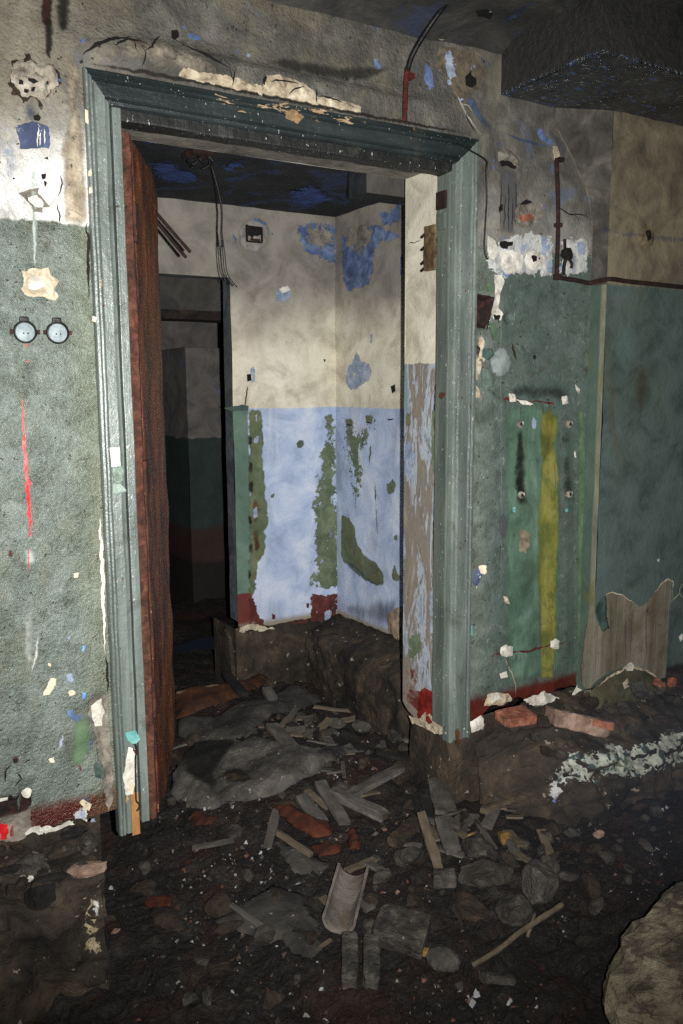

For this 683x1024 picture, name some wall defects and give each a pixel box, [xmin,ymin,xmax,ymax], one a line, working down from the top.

flaking render [3,53,62,160]
flaking render [179,68,365,124]
peeling [423,39,486,122]
flaking render [21,268,59,301]
peeling [297,205,401,291]
peeling [476,198,589,398]
peeling [346,353,372,390]
peeling [225,405,275,633]
peeling [287,414,400,624]
flaking render [386,591,433,659]
peeling [572,578,683,709]
peeling [548,729,683,803]